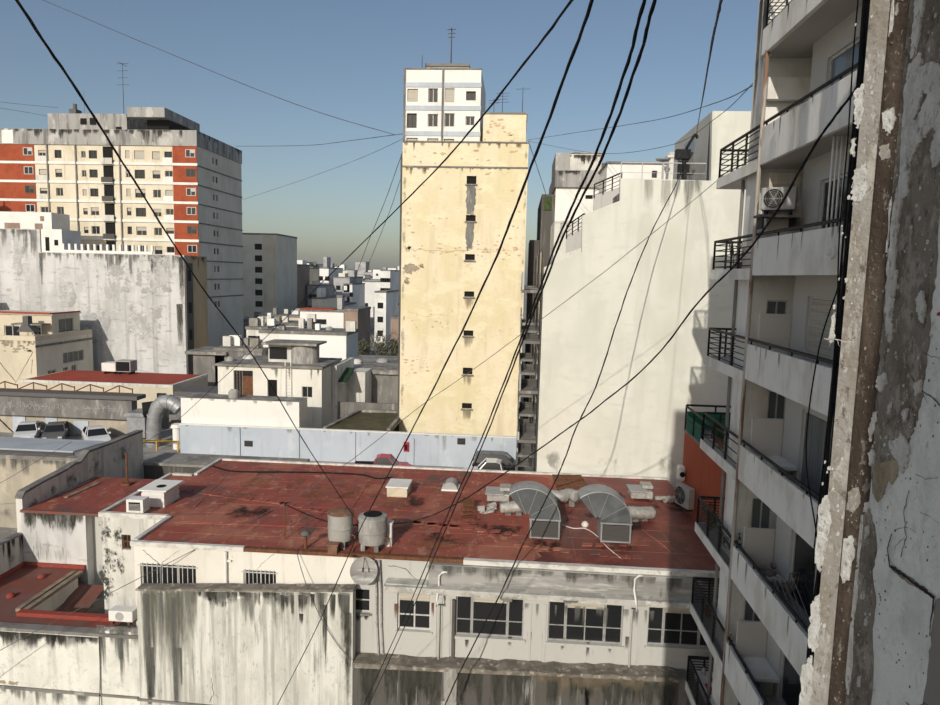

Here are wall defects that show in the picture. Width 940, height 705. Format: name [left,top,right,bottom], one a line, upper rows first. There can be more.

water stain [0,129,182,141]
water stain [0,229,61,276]
water stain [73,253,206,343]
peeling [815,0,940,705]
mould [99,525,124,599]
crack [887,474,938,637]
water stain [0,591,441,705]
water stain [456,673,530,705]
water stain [547,677,675,705]
peeling [799,593,826,705]